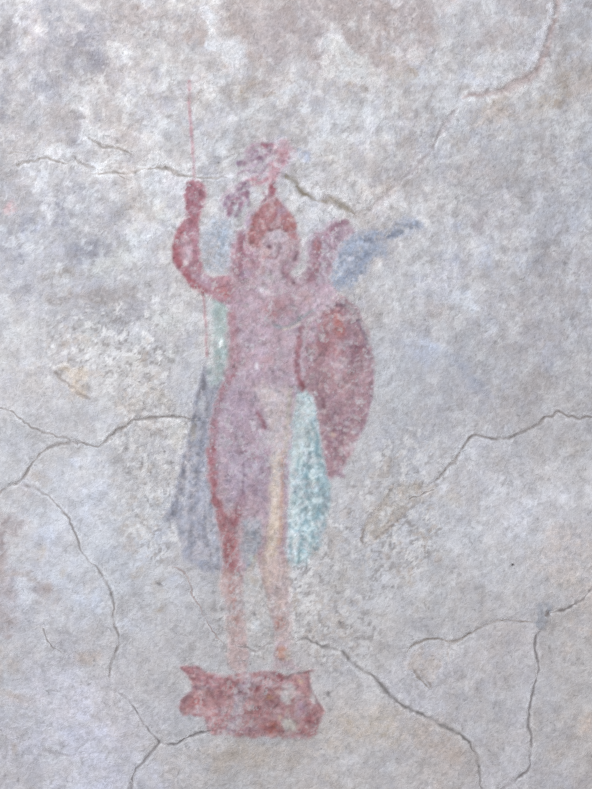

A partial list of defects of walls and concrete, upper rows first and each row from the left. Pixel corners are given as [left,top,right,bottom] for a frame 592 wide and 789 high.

crack [9,139,220,180]
crack [284,0,592,214]
crack [409,410,590,499]
crack [0,407,189,679]
crack [123,695,210,788]
crack [297,636,482,789]
crack [407,588,592,789]